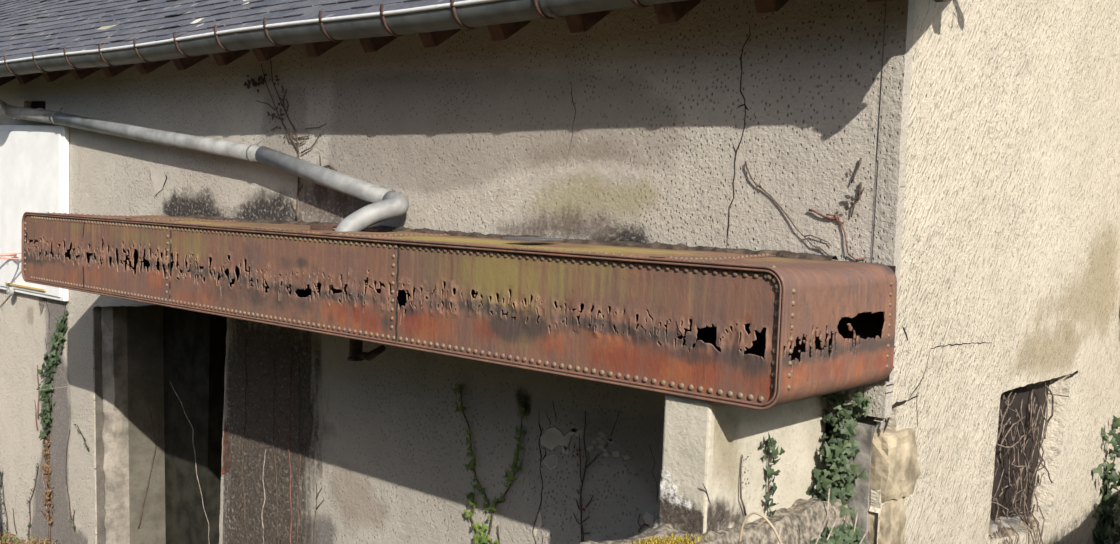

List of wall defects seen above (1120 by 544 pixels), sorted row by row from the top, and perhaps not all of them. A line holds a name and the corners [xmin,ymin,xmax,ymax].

crack [727,24,751,239]
water stain [164,194,223,217]
water stain [237,184,360,223]
water stain [522,214,648,244]
crack [883,327,986,433]
water stain [223,318,334,544]
peeling [540,426,621,470]